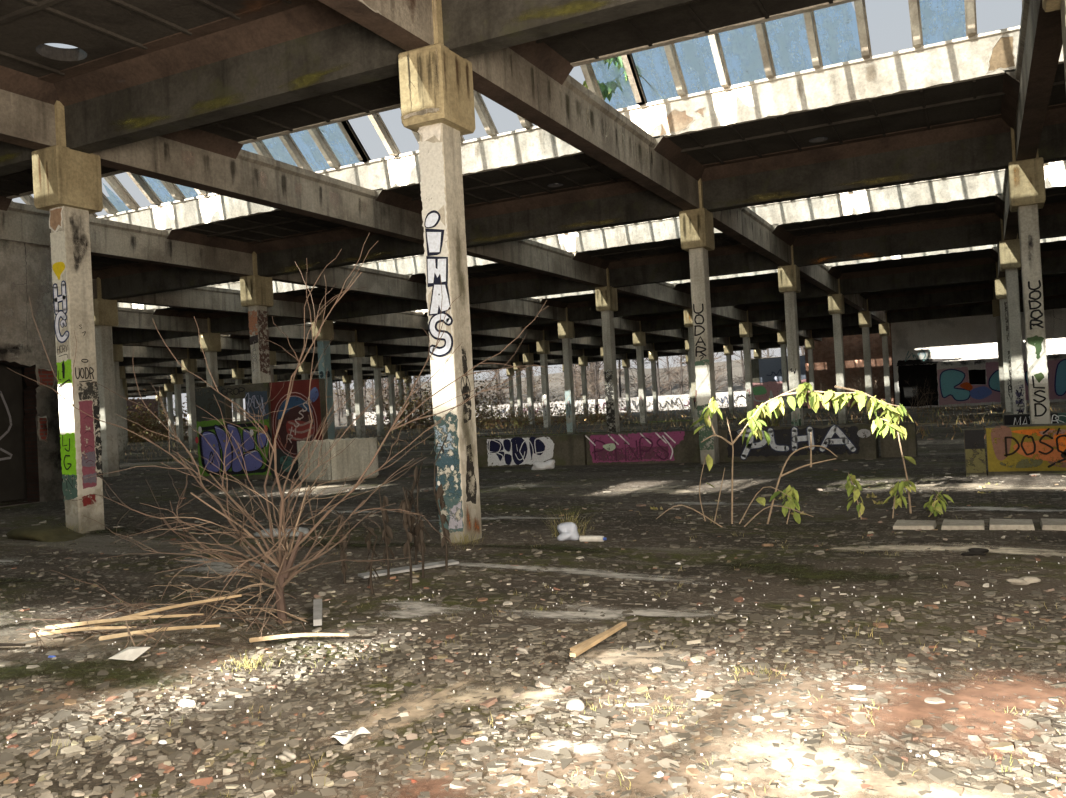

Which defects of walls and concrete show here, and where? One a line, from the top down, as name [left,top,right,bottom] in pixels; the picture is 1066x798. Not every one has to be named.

water stain [70,220,88,269]